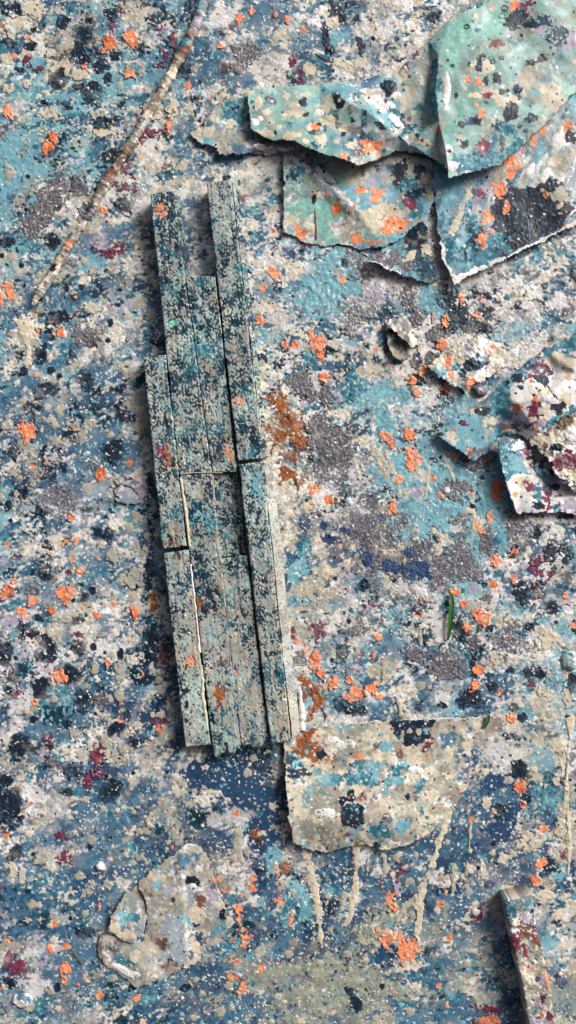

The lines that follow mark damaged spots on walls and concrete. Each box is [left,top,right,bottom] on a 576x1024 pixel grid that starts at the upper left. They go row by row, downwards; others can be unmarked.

peeling [190,96,282,156]
peeling [386,316,420,361]
peeling [427,333,510,396]
rust [262,380,316,493]
peeling [108,885,148,944]